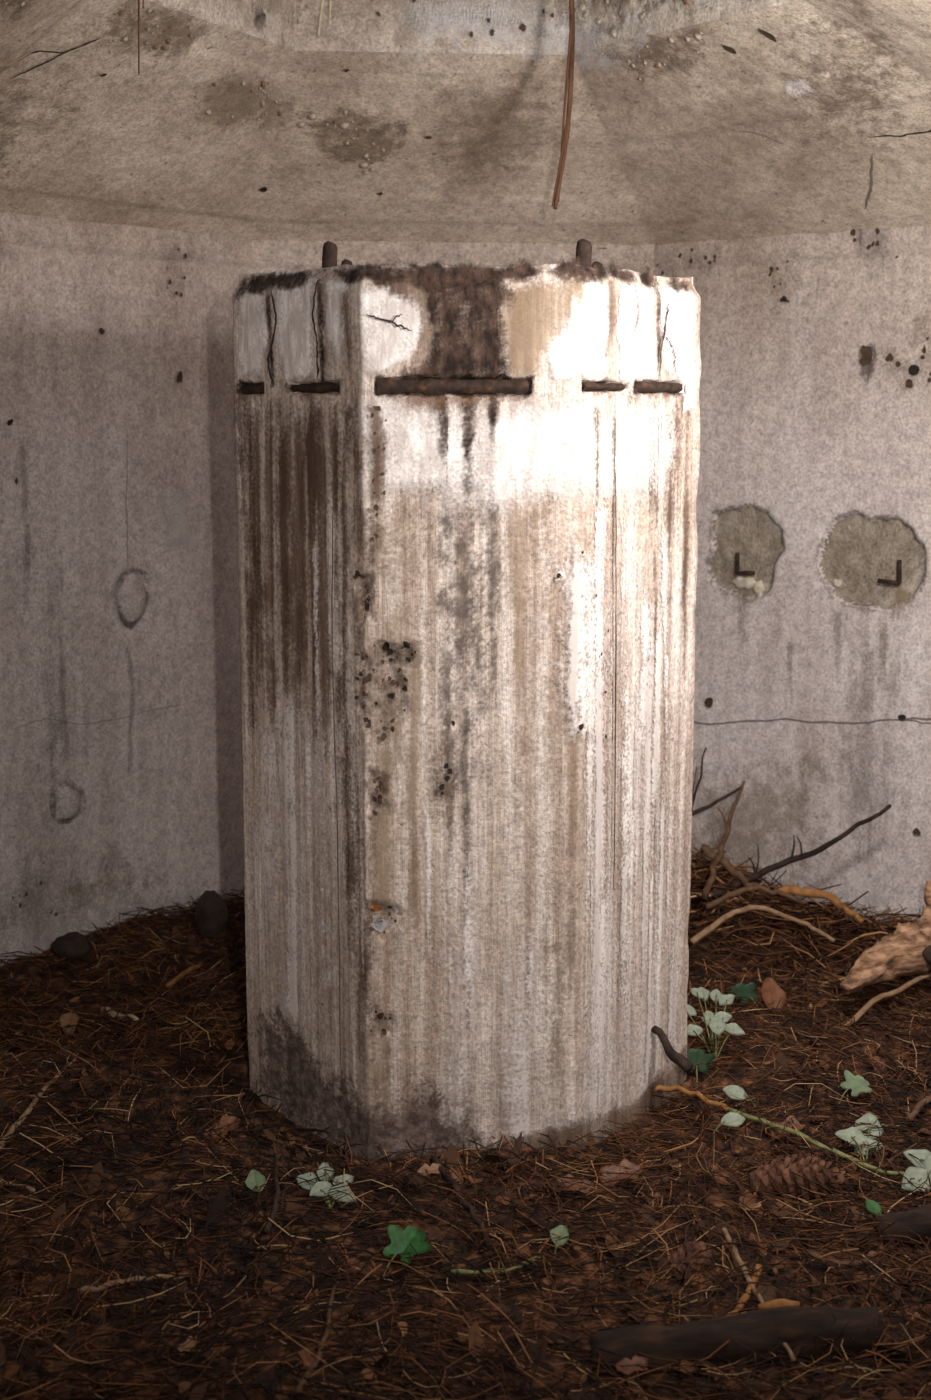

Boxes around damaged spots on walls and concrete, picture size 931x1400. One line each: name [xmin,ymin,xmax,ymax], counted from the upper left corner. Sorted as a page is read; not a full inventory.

crack [859,130,931,246]
rust [375,275,583,397]
water stain [238,267,697,1162]